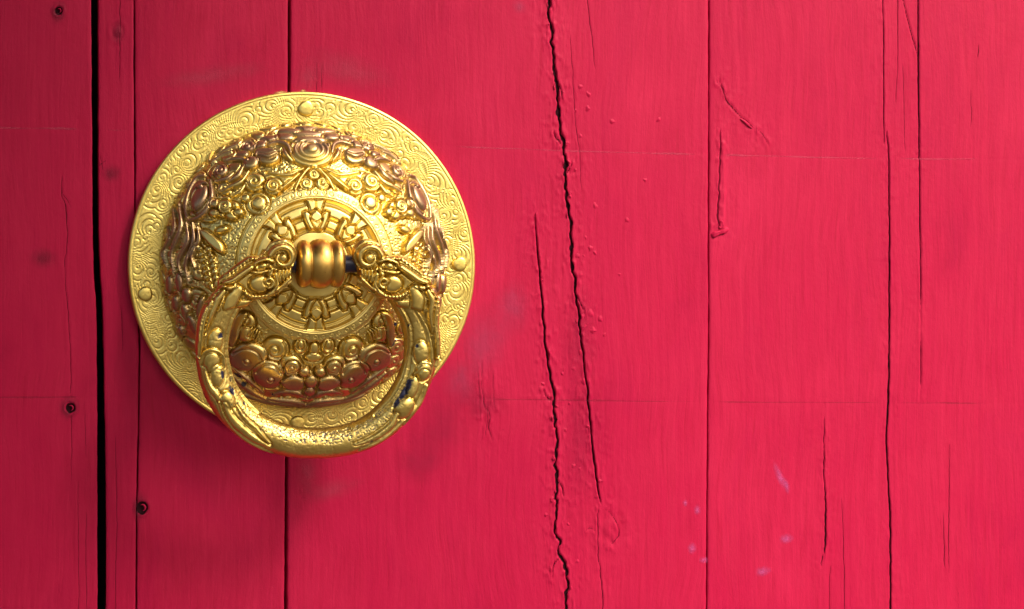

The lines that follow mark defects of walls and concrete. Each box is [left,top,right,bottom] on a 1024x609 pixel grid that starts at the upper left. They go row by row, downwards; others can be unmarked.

crack [534,215,572,609]
crack [547,0,620,609]
crack [821,437,845,609]